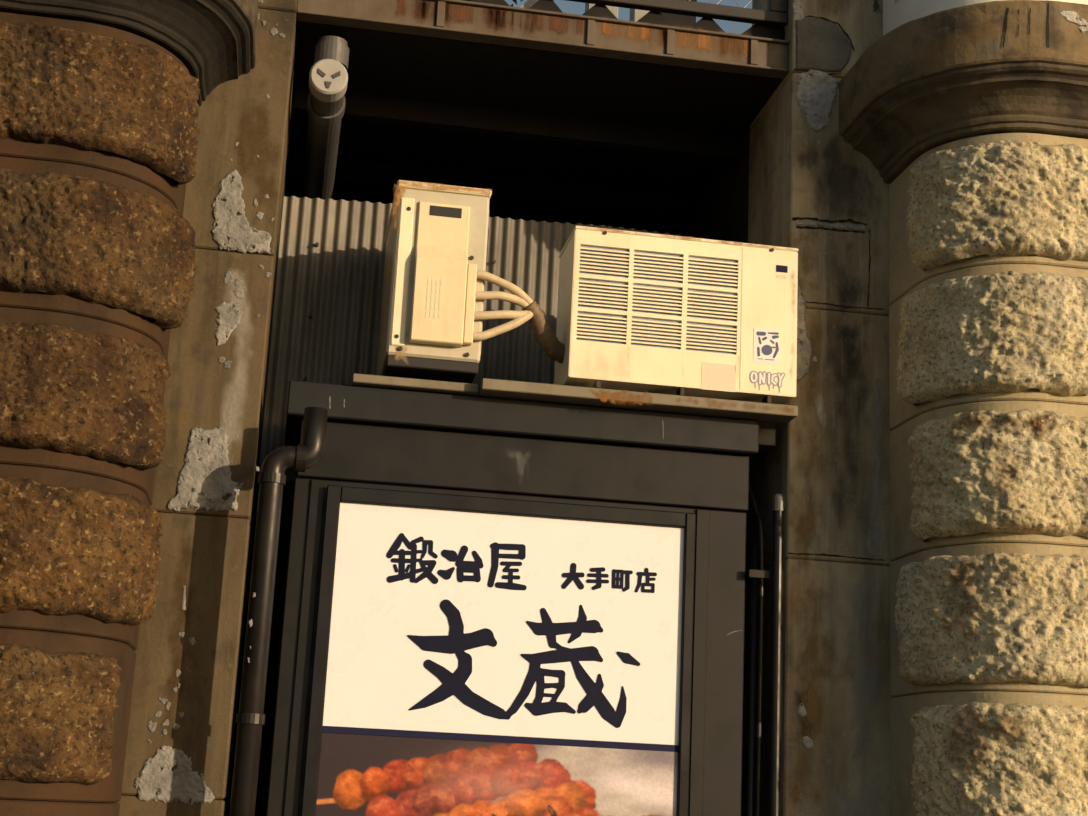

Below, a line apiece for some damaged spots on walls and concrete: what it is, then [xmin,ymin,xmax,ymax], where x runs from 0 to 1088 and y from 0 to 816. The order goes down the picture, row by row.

flaking render [258,0,286,38]
rust [397,0,514,31]
rust [601,22,749,57]
flaking render [795,69,839,145]
flaking render [211,159,274,278]
flaking render [215,271,244,369]
flaking render [796,279,817,390]
flaking render [167,426,244,512]
damp [799,619,831,737]
flaking render [134,668,215,805]